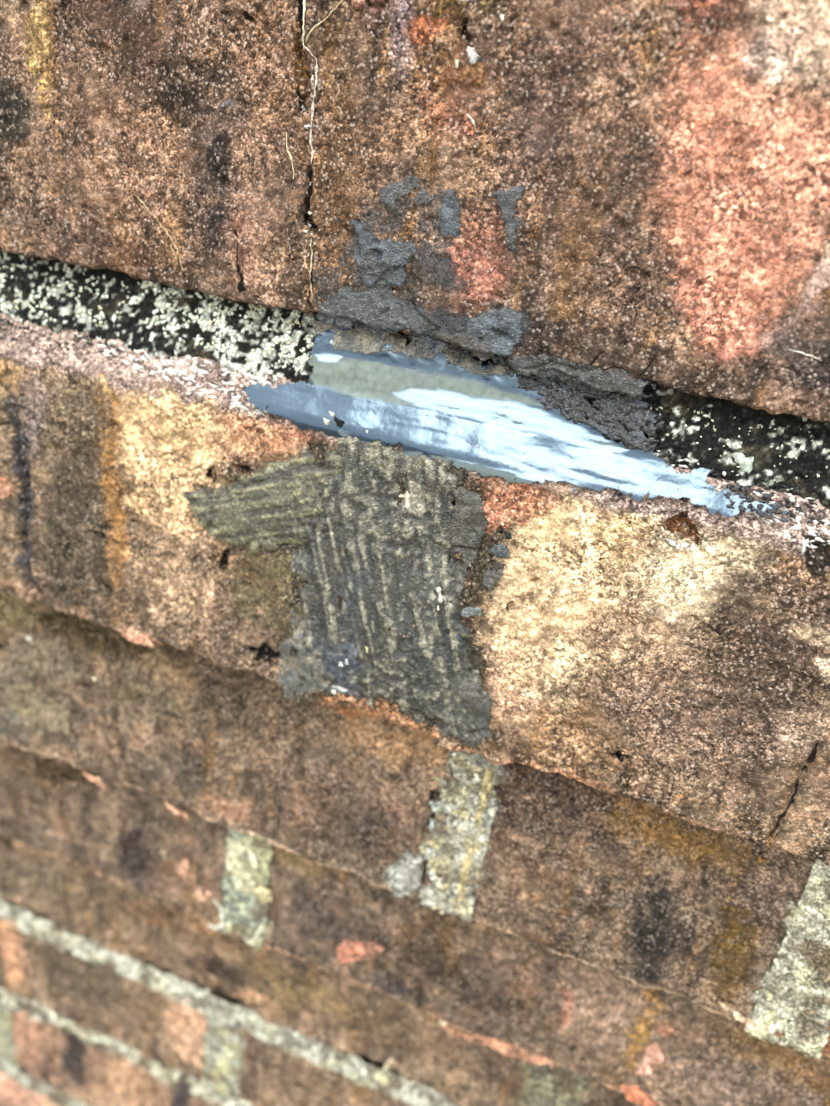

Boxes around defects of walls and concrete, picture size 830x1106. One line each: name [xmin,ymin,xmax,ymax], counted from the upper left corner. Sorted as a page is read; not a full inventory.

crack [286,0,343,318]
crack [352,324,507,360]
crack [0,365,44,596]
crack [769,742,819,836]